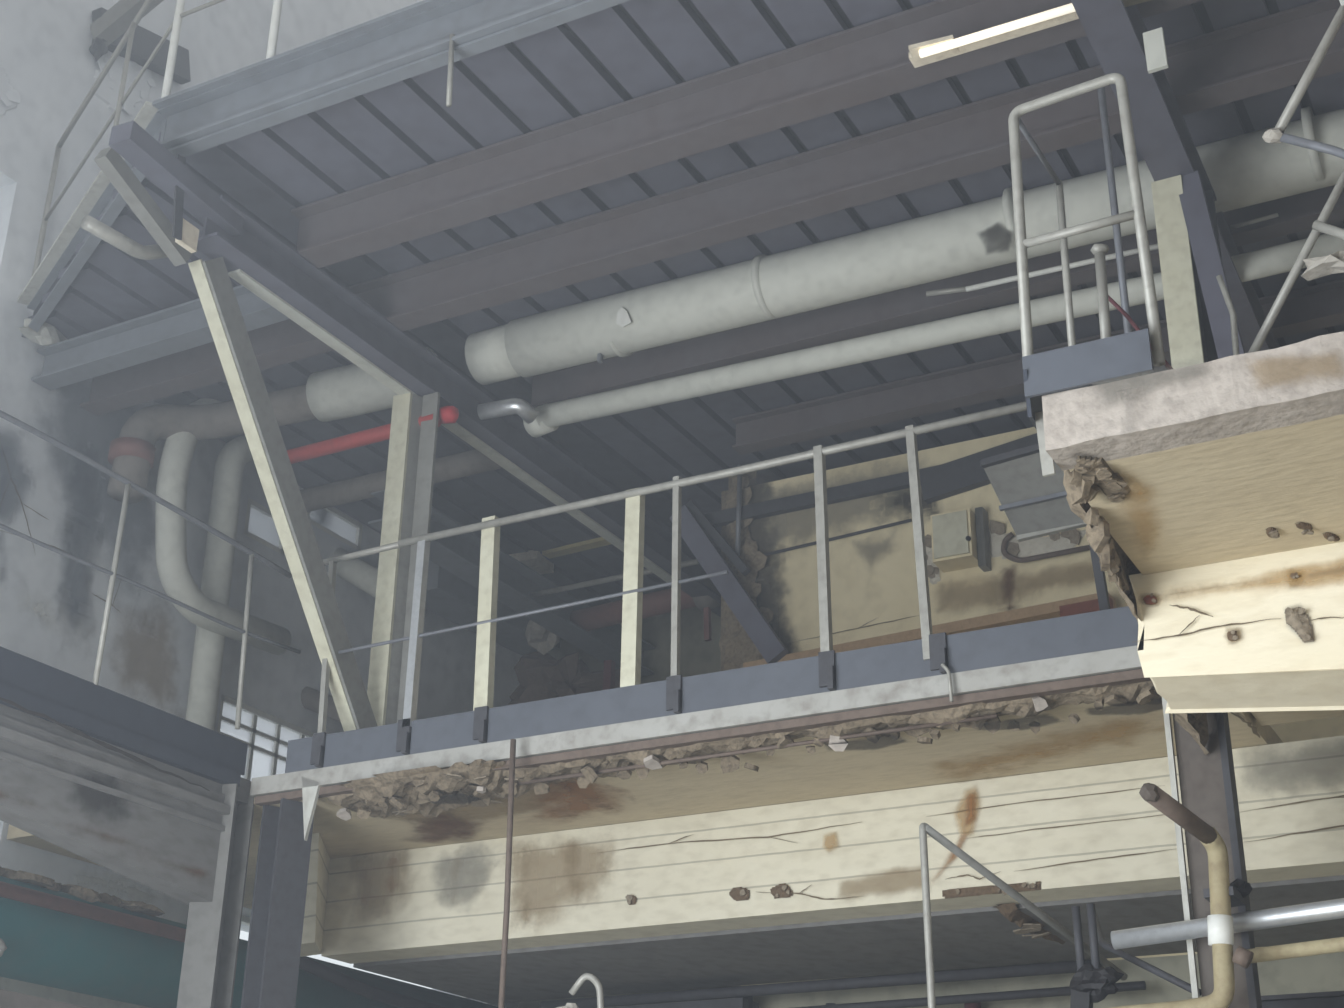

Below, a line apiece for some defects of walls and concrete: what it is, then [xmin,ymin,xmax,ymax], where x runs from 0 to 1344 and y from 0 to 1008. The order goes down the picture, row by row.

leakage [56,382,152,619]
spalling [989,455,1157,622]
crack [1132,605,1270,643]
spalling [326,681,1209,821]
rust [945,792,977,866]